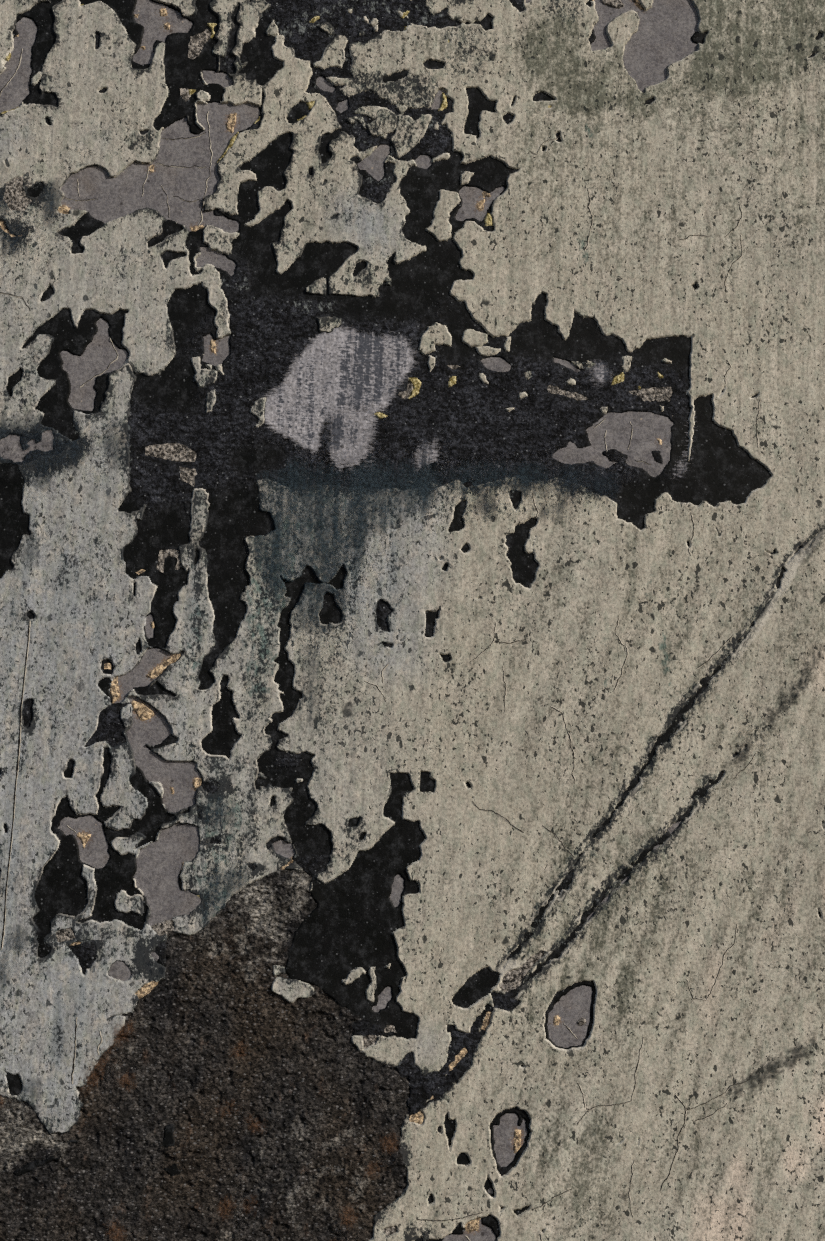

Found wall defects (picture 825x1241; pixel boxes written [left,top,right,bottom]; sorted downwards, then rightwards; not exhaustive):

peeling [0,0,62,125]
peeling [57,0,771,690]
water stain [0,418,83,481]
peeling [0,309,129,578]
water stain [255,464,499,626]
crack [686,512,694,556]
crack [613,615,629,692]
crack [551,706,576,784]
spalling [592,621,754,838]
spalling [0,519,611,1241]
crack [472,801,575,858]
crack [686,925,737,1000]